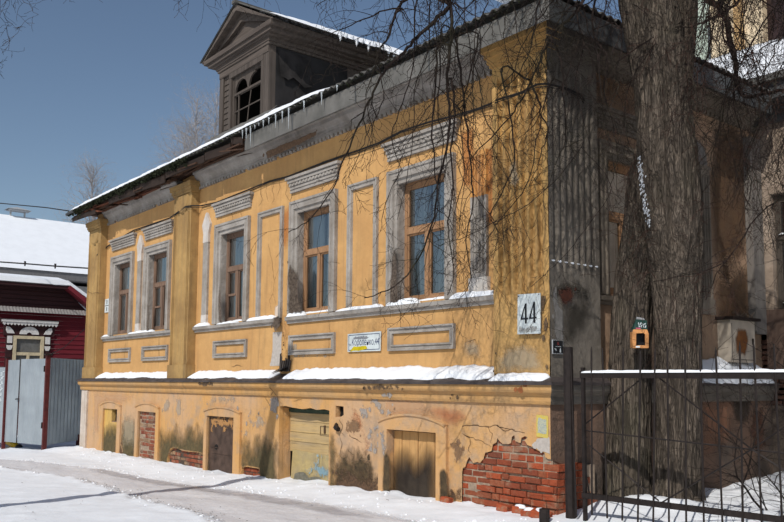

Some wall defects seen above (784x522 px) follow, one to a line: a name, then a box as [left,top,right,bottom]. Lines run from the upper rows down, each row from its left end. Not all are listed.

damp [552,284,588,341]
flaking render [170,448,203,468]
peeling [207,397,239,433]
damp [242,441,276,479]
peeling [346,384,403,460]
crack [462,425,524,456]
flaking render [448,436,566,515]
flaking render [575,462,598,509]